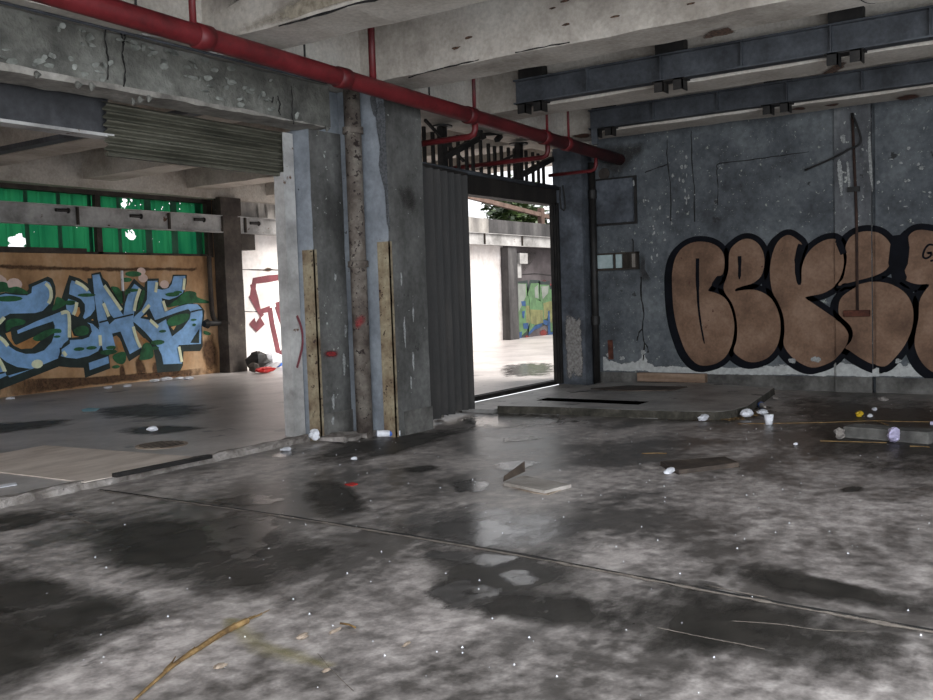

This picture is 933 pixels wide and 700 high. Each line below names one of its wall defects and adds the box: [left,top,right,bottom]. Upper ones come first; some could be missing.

crack [279,0,378,27]
peeling [32,52,56,79]
crack [104,30,126,87]
peeling [116,37,278,111]
crack [637,277,649,360]
peeling [565,316,583,378]
peeling [603,350,922,377]
damp [0,420,67,433]
damp [100,404,201,435]
damp [308,482,362,513]
damp [0,564,152,686]